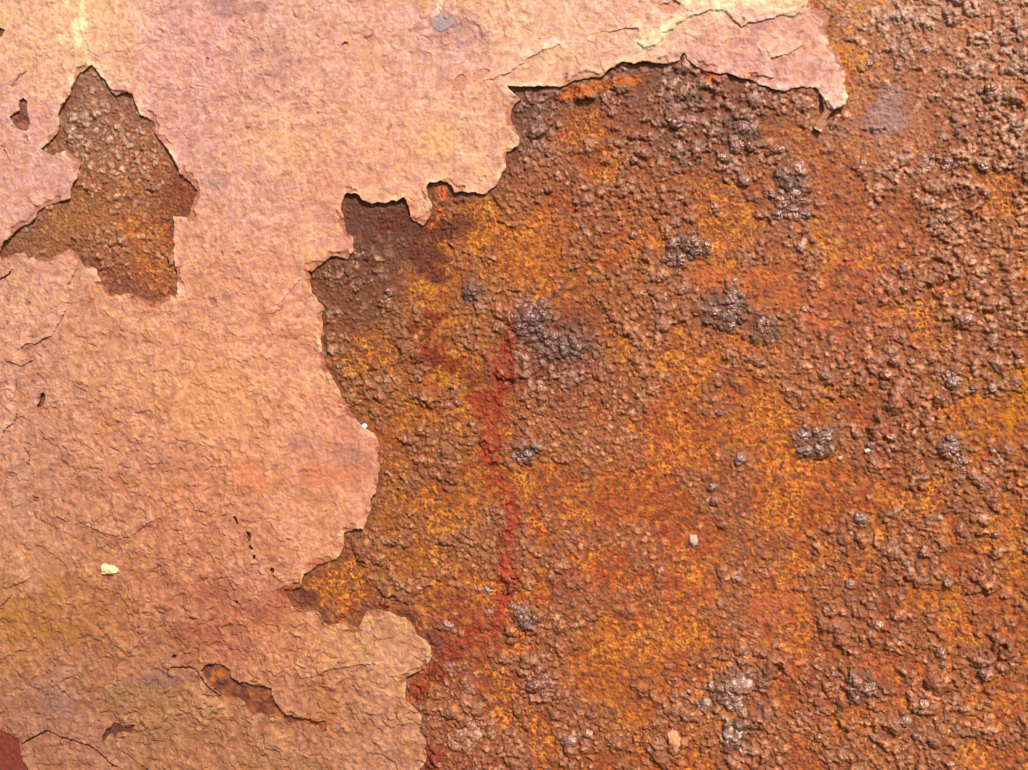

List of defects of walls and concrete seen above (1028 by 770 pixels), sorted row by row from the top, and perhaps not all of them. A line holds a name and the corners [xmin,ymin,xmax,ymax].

rust [561,76,642,98]
rust [864,86,907,132]
peeling [0,65,197,442]
rust [380,187,472,282]
peeling [284,0,1028,770]
rust [407,311,521,700]
peeling [187,661,327,732]
rust [425,745,444,766]